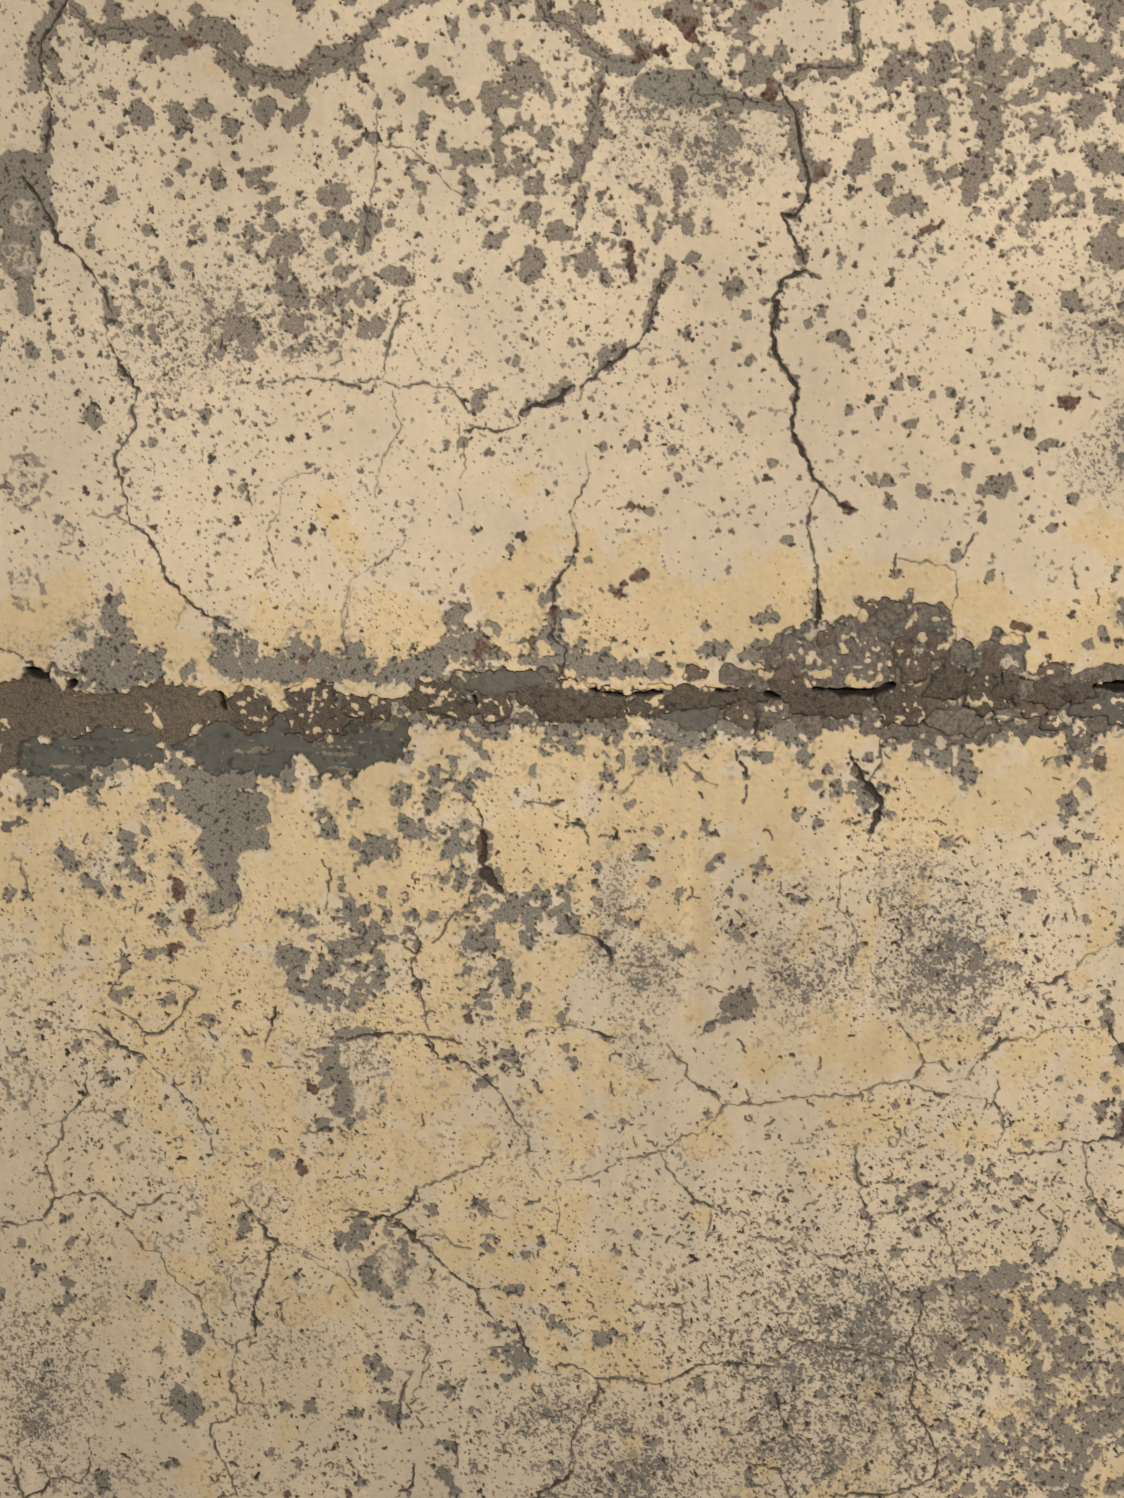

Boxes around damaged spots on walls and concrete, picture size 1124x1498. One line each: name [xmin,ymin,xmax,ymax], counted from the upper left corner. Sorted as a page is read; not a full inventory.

crack [22,0,466,631]
crack [266,269,671,512]
crack [692,2,861,631]
peeling [845,376,974,424]
peeling [915,427,1065,501]
spalling [0,570,1124,1155]
crack [619,681,896,805]
crack [0,979,359,1498]
crack [340,740,1124,1498]
peeling [887,1176,951,1261]
peeling [957,1155,1029,1235]
peeling [888,1199,1124,1498]